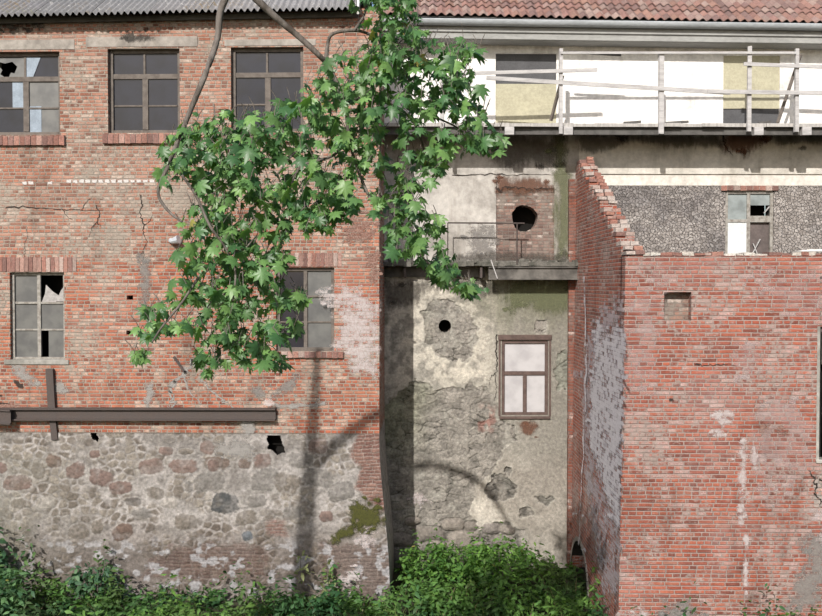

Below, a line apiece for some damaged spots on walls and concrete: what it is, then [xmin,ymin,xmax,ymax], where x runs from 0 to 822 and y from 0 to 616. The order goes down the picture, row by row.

crack [5,198,102,257]
crack [138,195,152,262]
flaking render [420,299,480,362]
leakage [354,528,376,549]
flaking render [385,378,527,568]
spalling [519,506,535,518]
spalling [535,496,555,505]
peeling [553,292,628,602]
crack [810,471,822,505]